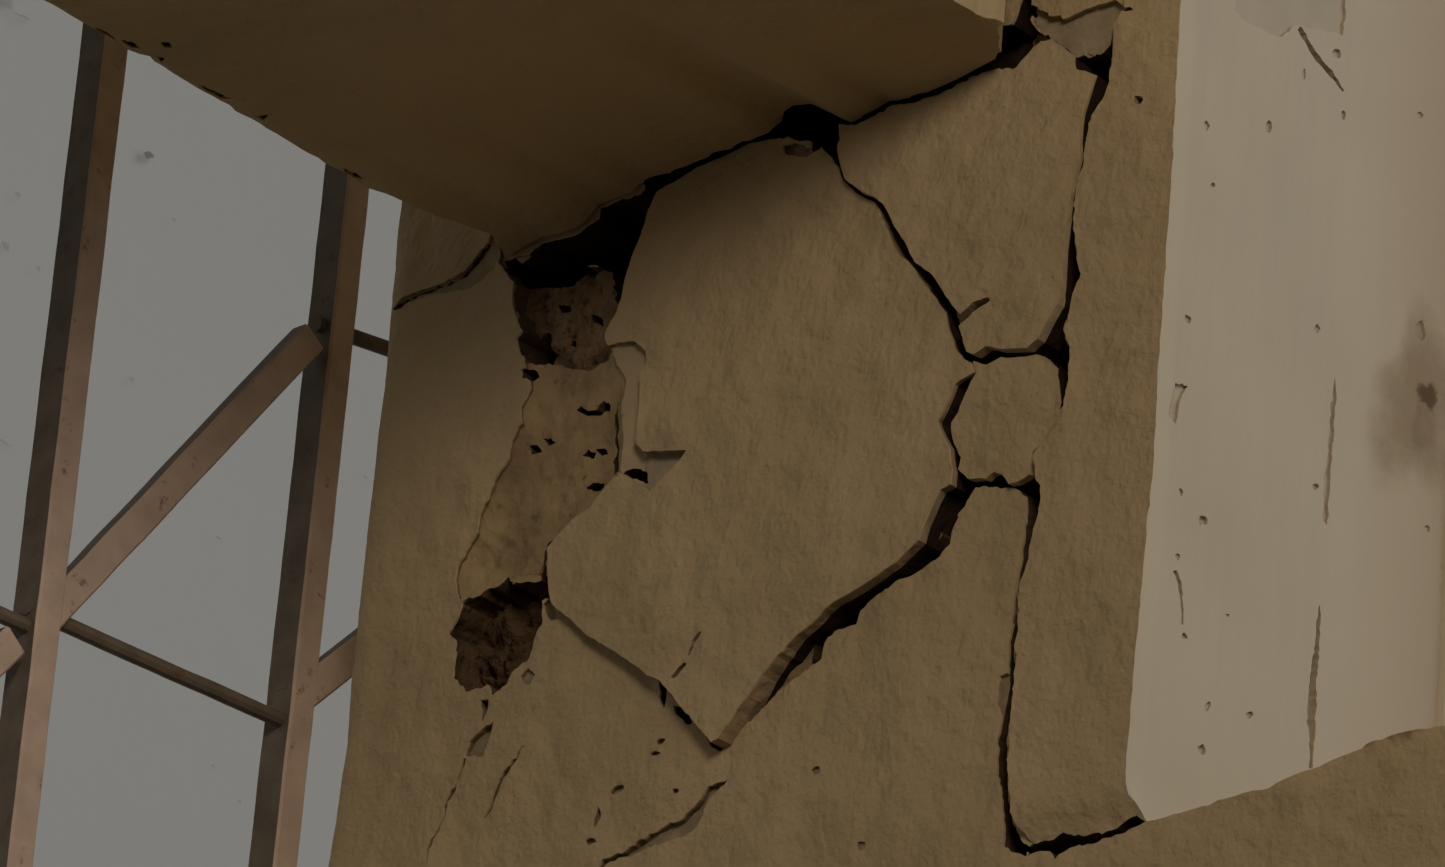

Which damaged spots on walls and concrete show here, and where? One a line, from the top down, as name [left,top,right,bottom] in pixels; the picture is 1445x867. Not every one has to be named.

crack [642,0,1124,195]
crack [1298,27,1344,91]
crack [393,235,514,311]
flaking render [448,189,683,695]
crack [1323,381,1337,525]
crack [426,699,524,864]
crack [520,668,535,685]
crack [543,599,556,620]
crack [658,682,723,752]
crack [776,645,823,694]
crack [996,487,1145,860]
crack [1307,605,1321,768]